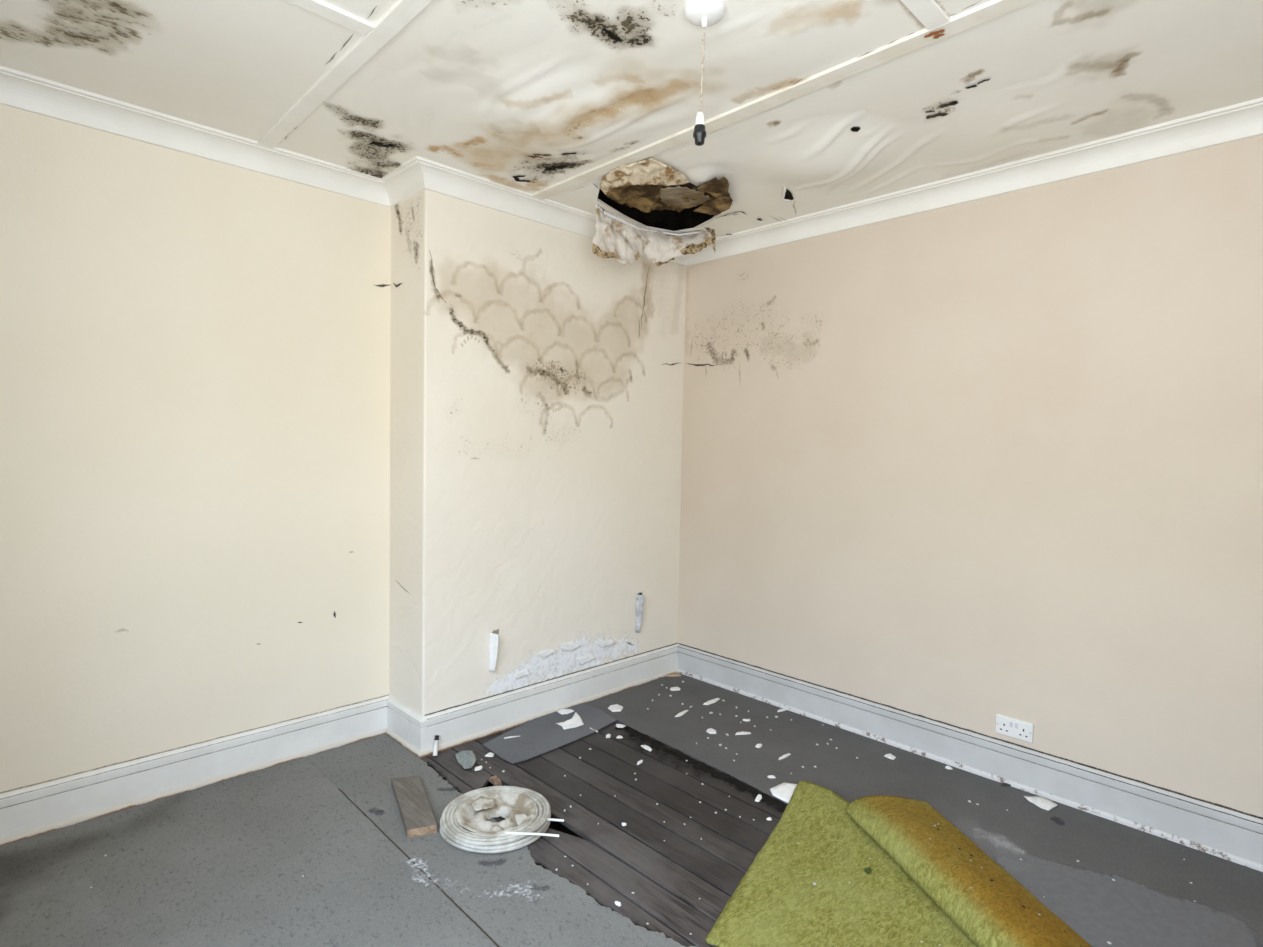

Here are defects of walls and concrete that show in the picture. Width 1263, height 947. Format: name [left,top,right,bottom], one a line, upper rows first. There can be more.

water stain [0,0,150,52]
water stain [562,1,668,49]
water stain [924,101,958,119]
water stain [329,105,407,178]
water stain [512,153,590,185]
peeling [489,593,644,694]